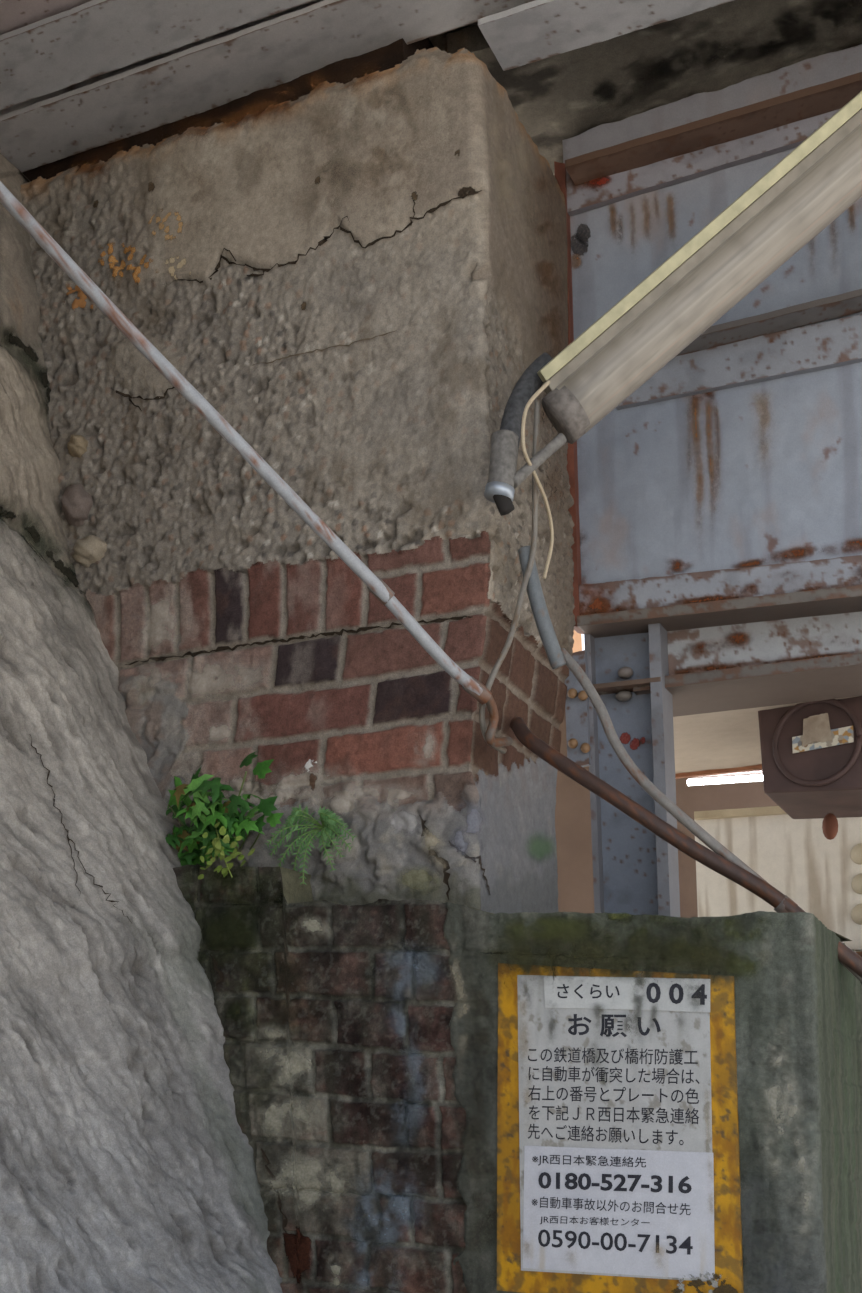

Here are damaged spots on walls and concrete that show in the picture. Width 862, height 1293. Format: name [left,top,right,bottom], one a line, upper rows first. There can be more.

leakage [760,0,861,54]
leakage [594,83,614,101]
spalling [458,187,478,198]
crack [171,190,482,283]
spalling [98,242,191,283]
corrosion [692,392,719,501]
corrosion [843,539,862,552]
corrosion [736,547,814,568]
corrosion [684,584,757,604]
corrosion [727,632,749,646]
corrosion [675,642,735,675]
corrosion [767,652,853,664]